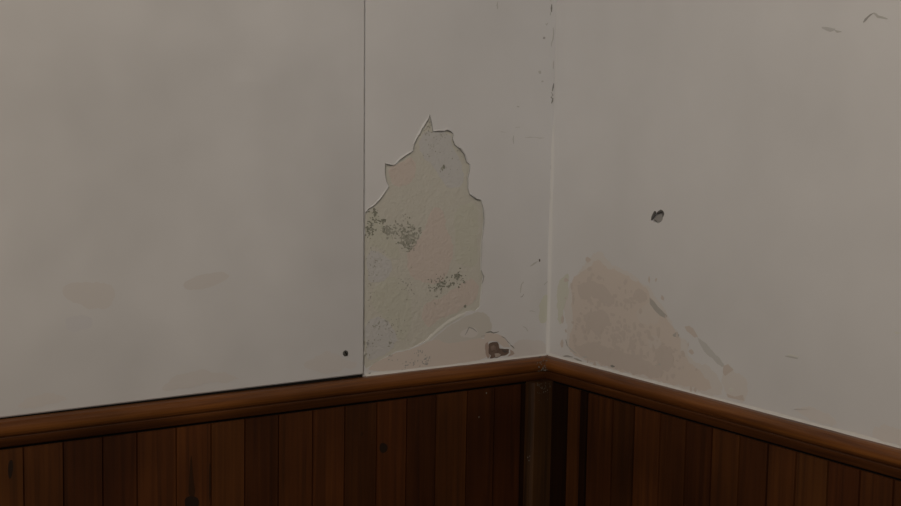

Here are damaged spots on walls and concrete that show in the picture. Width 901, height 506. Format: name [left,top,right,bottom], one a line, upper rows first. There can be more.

peeling [363,114,485,368]
damp [364,207,546,371]
hole [489,342,509,359]
damp [539,252,748,403]